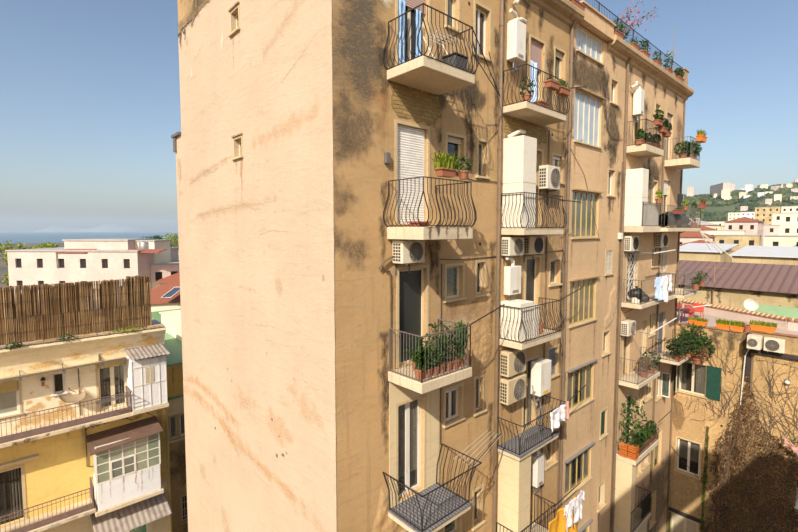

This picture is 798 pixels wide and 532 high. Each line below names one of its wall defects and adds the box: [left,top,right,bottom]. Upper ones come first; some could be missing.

flaking render [390,81,440,127]
damp [439,82,485,172]
peeling [17,386,75,428]